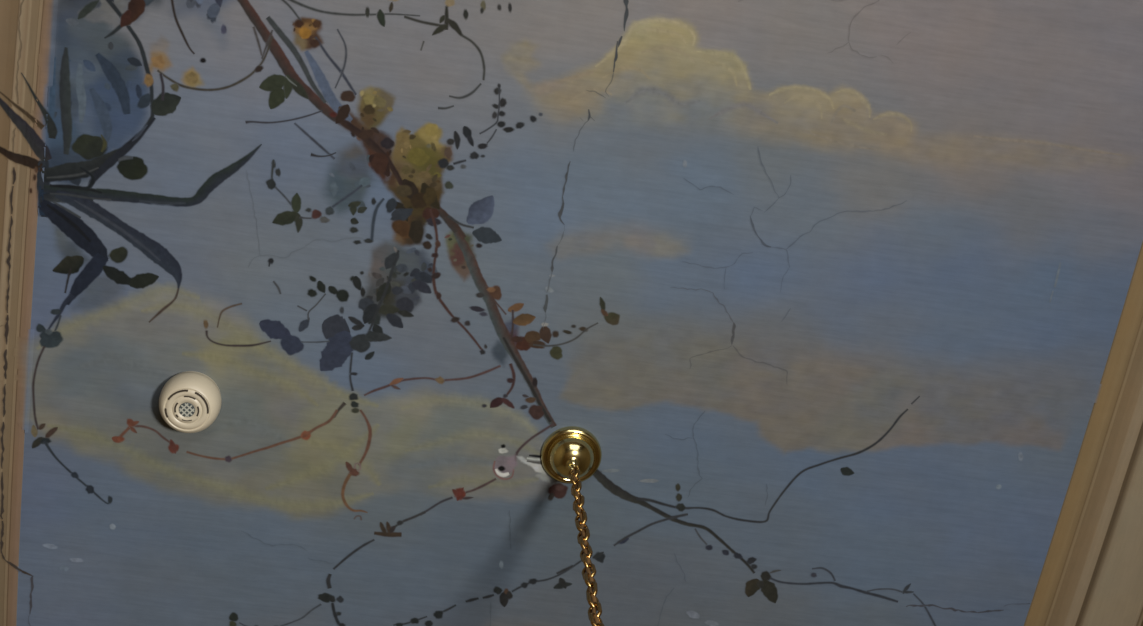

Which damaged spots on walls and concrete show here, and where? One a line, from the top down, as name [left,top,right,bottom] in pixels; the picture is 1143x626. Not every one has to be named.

crack [0,0,34,626]
crack [543,0,629,330]
crack [670,147,907,383]